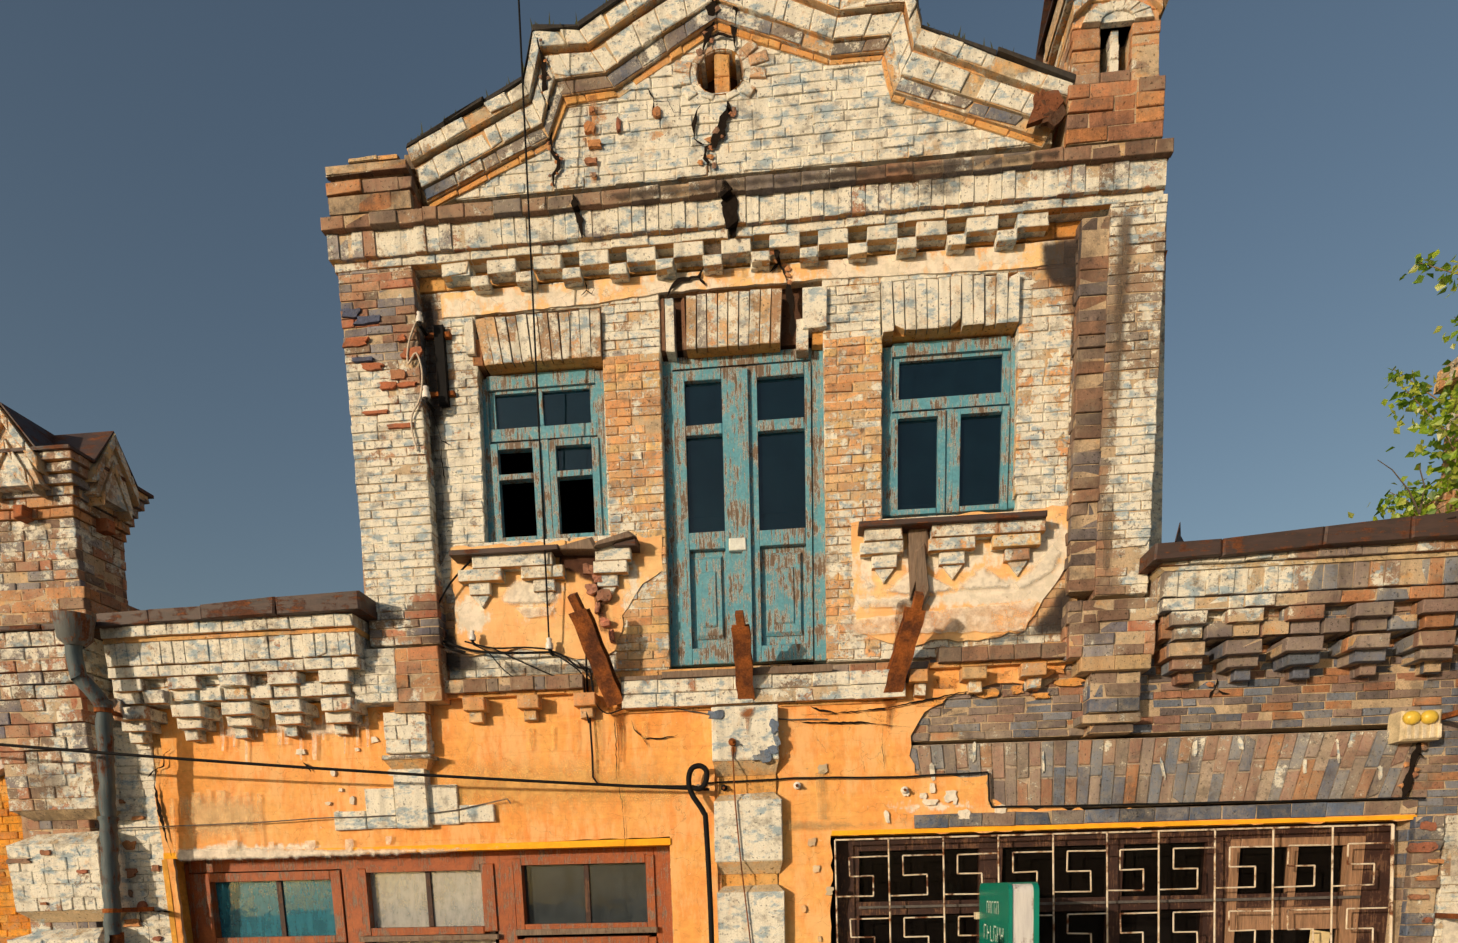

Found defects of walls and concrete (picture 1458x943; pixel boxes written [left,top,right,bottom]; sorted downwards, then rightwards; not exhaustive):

crack [696,0,740,55]
crack [537,37,584,238]
crack [640,89,796,336]
spalling [583,563,616,643]
peeling [842,597,1037,635]
flaking render [916,677,959,706]
flaking render [976,664,1085,699]
crack [148,750,172,856]
flaking render [325,767,355,812]
flaking render [902,763,970,819]
crack [1394,742,1428,797]